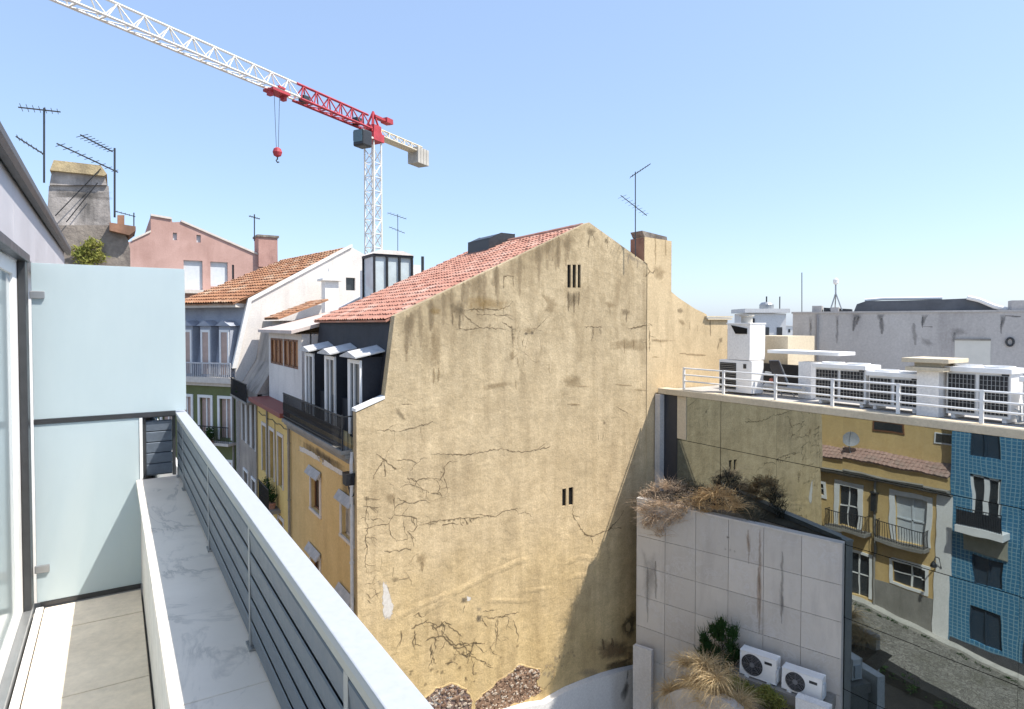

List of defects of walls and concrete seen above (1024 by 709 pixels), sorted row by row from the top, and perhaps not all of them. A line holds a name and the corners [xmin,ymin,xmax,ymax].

crack [460,275,545,344]
crack [362,404,548,604]
peeling [382,582,393,619]
crack [398,606,519,675]